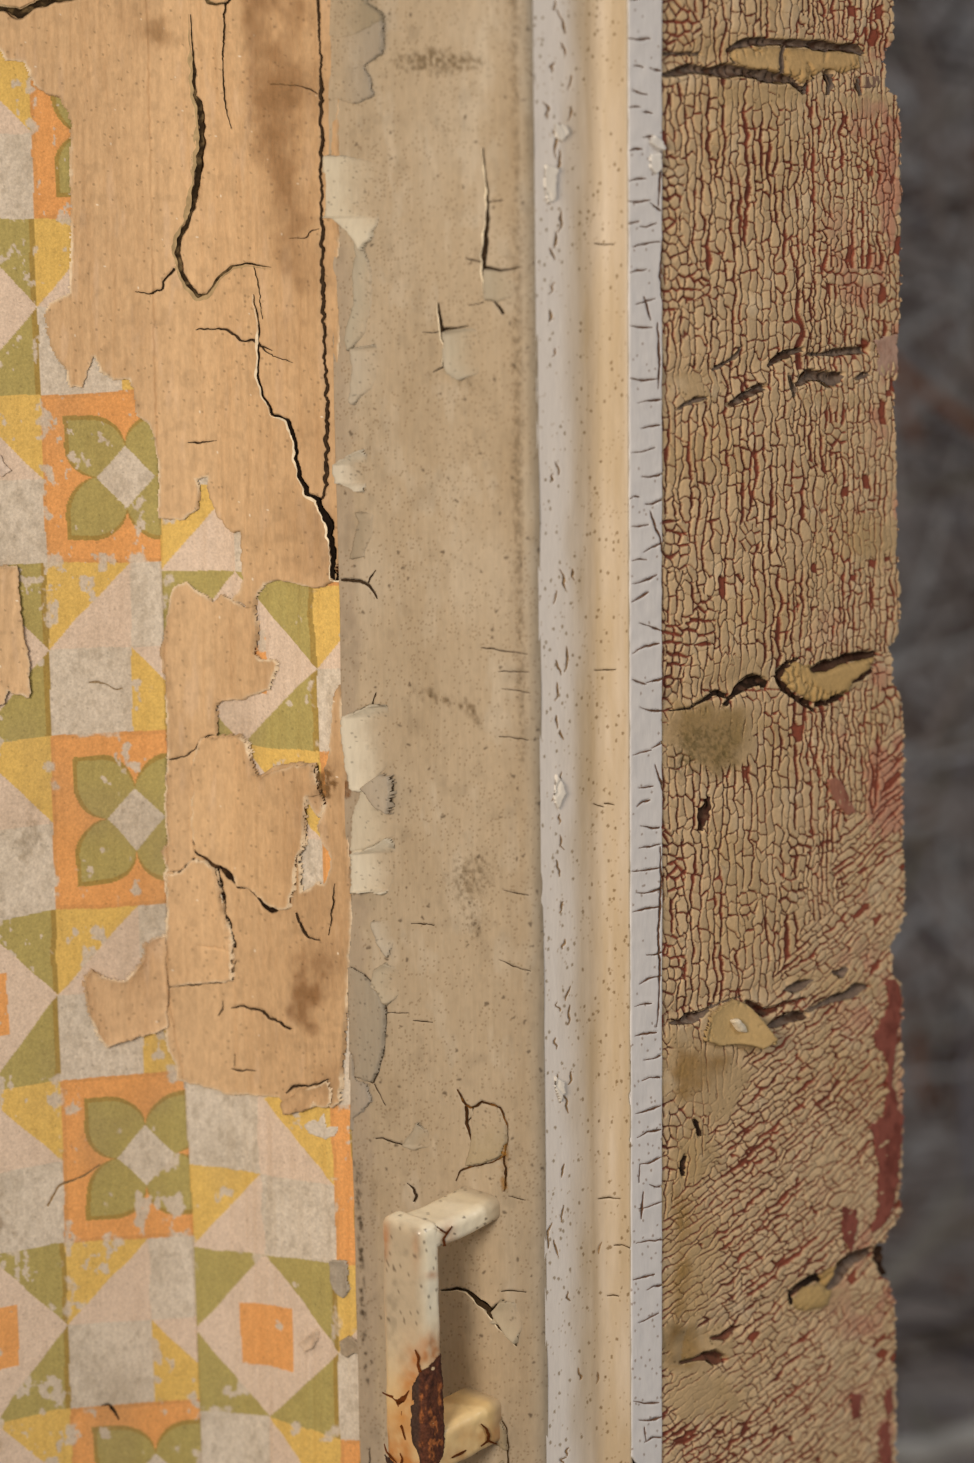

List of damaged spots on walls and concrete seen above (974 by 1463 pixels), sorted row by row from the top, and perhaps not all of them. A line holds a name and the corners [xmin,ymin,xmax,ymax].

crack [0,0,68,19]
peeling [728,46,880,88]
crack [423,1,572,372]
crack [135,0,378,599]
peeling [0,0,400,1131]
crack [481,37,662,1323]
peeling [780,657,875,702]
crack [170,841,335,1030]
peeling [702,998,778,1049]
crack [456,1089,524,1200]
peeling [793,978,905,1311]
peeling [877,1387,894,1463]